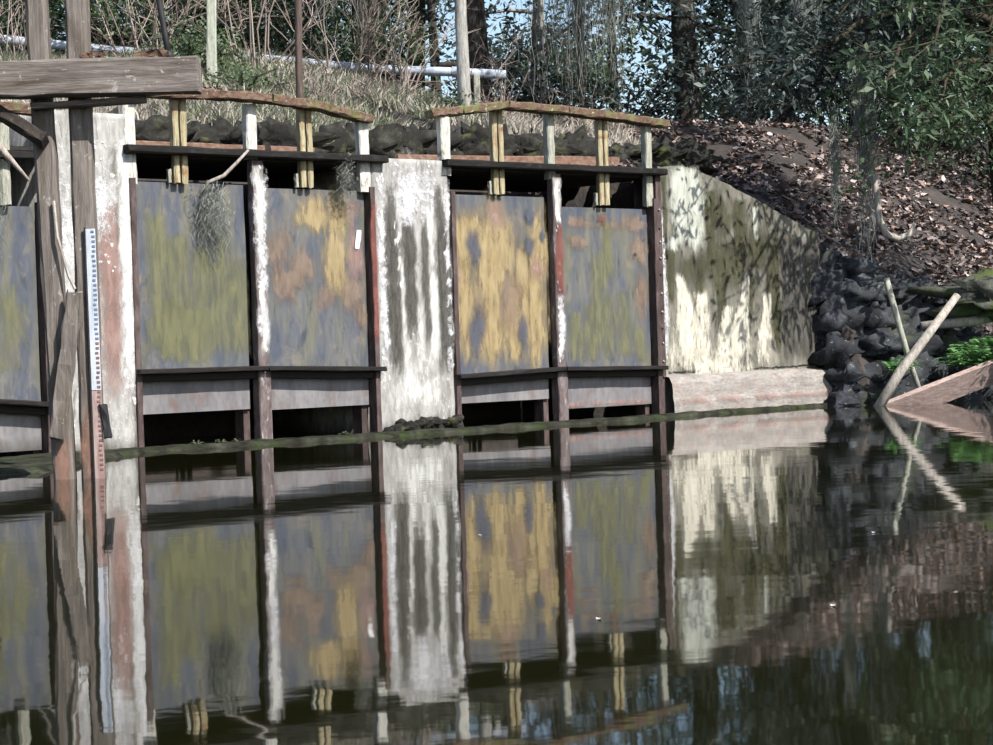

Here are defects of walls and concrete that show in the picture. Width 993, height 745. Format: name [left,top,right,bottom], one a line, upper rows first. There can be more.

damp [383,188,455,405]
corrosion [456,209,587,364]
corrosion [628,217,645,264]
corrosion [636,279,647,314]
damp [670,167,704,251]
damp [670,232,818,374]